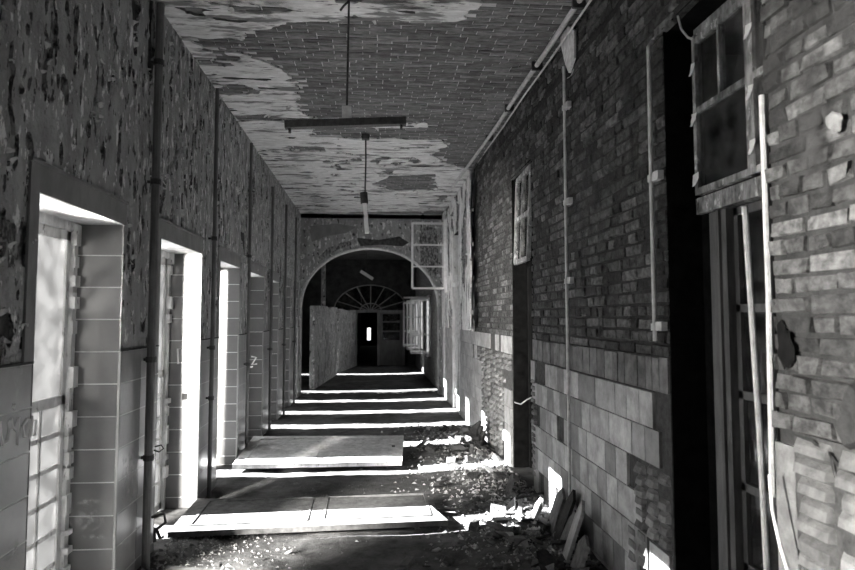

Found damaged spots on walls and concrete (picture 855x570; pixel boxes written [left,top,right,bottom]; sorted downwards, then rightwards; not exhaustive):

flaking render [5,41,19,177]
flaking render [40,0,59,101]
flaking render [91,0,156,150]
flaking render [0,207,37,268]
flaking render [127,223,137,284]
flaking render [181,0,589,387]
flaking render [0,307,29,365]
spalling [777,320,795,370]
peeling [628,457,674,569]